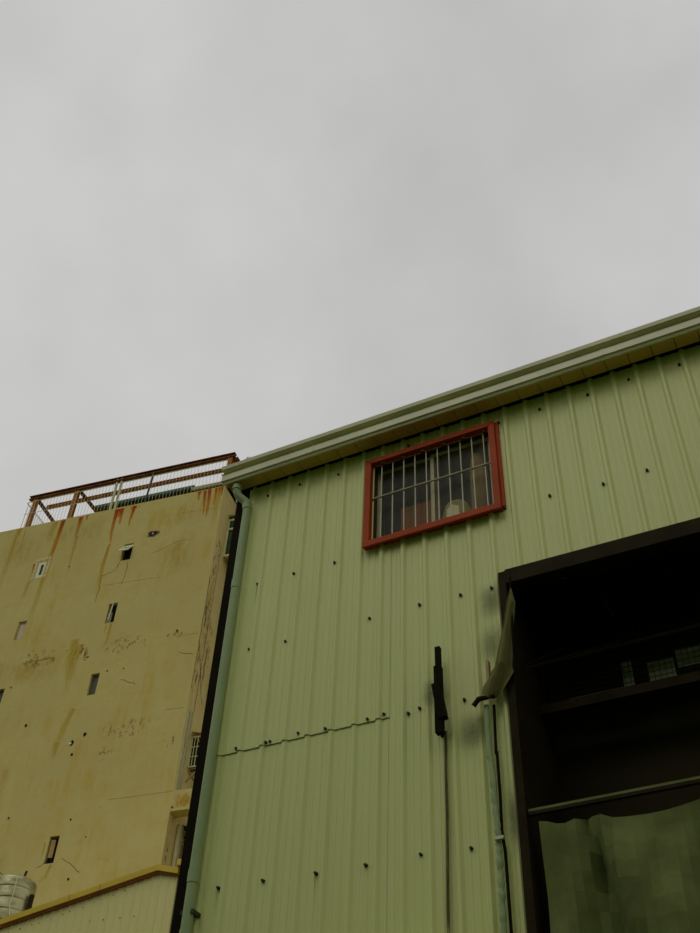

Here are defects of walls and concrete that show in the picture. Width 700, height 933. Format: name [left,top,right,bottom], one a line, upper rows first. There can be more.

rust [198,486,224,514]
rust [26,520,65,593]
rust [100,505,140,578]